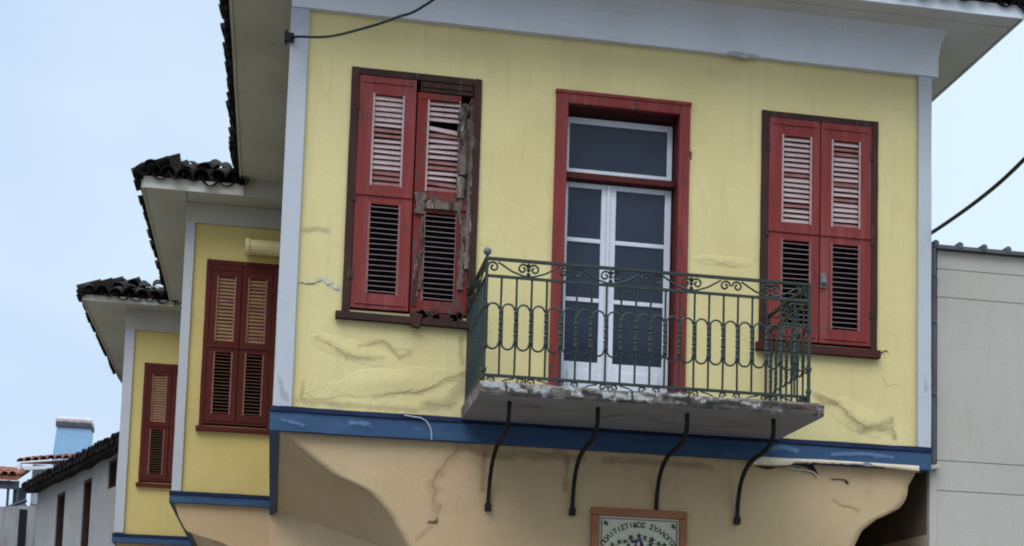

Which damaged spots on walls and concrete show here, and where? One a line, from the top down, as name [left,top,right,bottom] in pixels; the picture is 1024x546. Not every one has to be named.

peeling [482,381,551,393]
peeling [602,392,652,401]
peeling [669,393,763,408]
spalling [752,457,919,476]